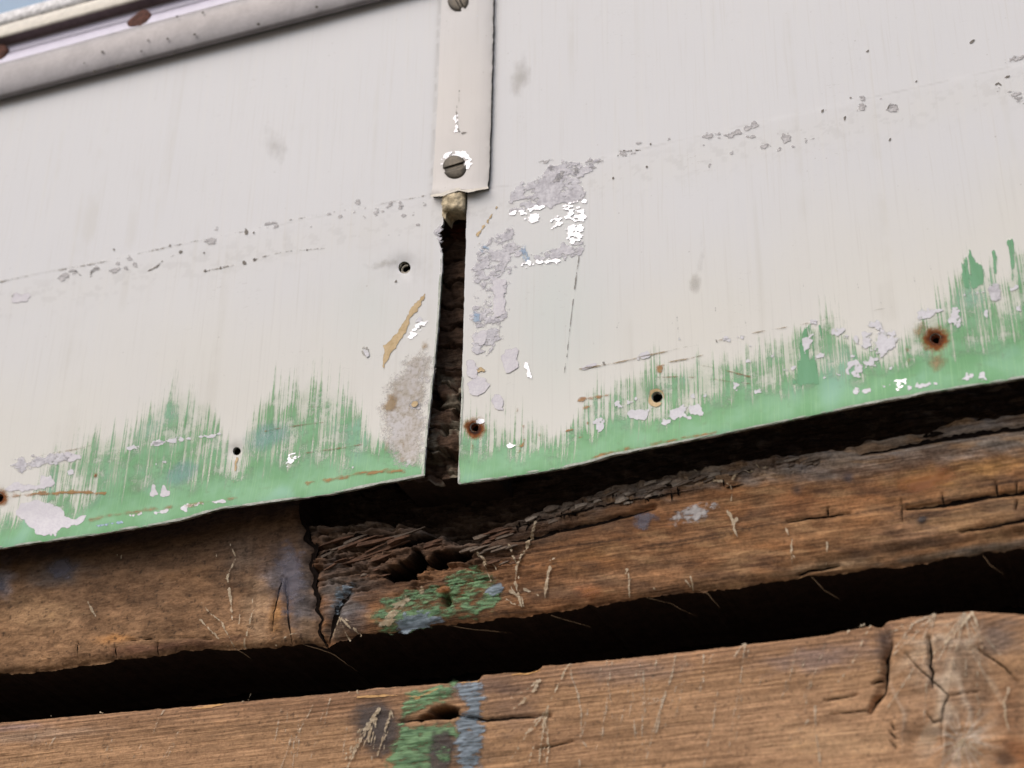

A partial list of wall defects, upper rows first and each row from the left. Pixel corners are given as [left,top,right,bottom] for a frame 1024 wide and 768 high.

peeling [702,121,807,151]
peeling [458,158,1024,483]
rust [917,327,948,367]
peeling [0,260,441,548]
rust [464,418,485,438]
crack [788,510,846,523]
crack [901,484,1024,533]
crack [799,566,838,576]
crack [272,582,292,642]
crack [329,594,351,643]
crack [828,640,976,749]